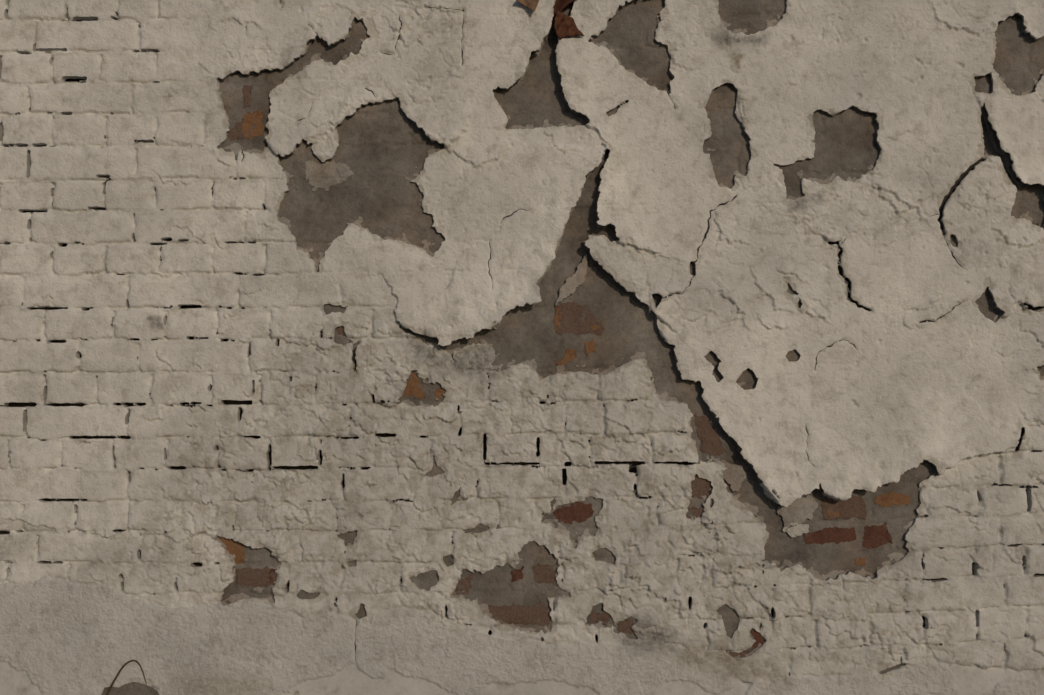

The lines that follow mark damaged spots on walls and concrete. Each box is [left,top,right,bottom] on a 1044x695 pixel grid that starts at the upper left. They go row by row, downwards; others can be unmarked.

crack [932,158,985,268]
peeling [217,0,1044,580]
crack [828,238,870,311]
crack [1023,303,1044,311]
peeling [217,536,281,605]
peeling [401,541,571,640]
peeling [102,682,159,695]